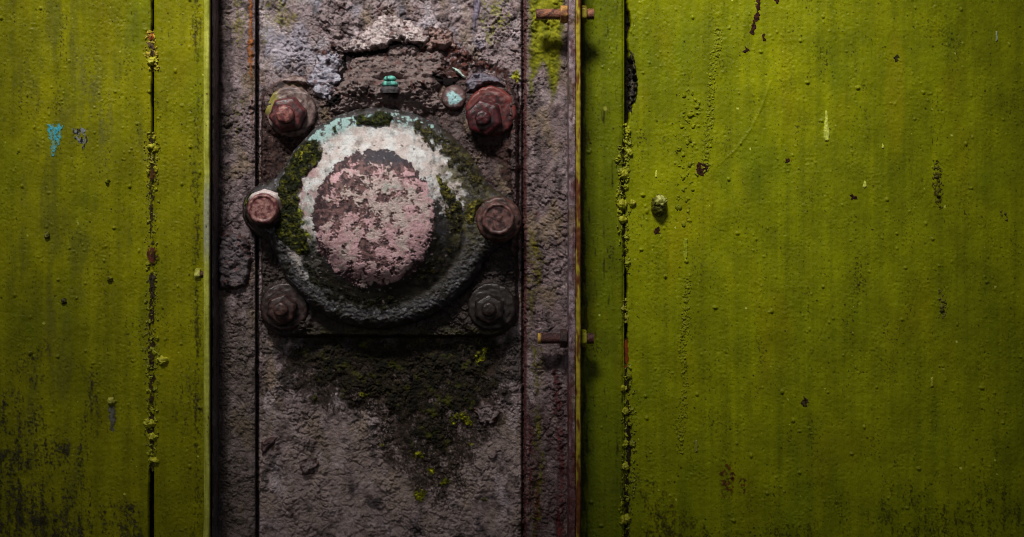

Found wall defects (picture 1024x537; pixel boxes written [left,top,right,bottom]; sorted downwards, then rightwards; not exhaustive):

peeling [279,14,457,102]
corrosion [314,35,509,117]
peeling [452,67,505,93]
corrosion [251,87,314,184]
corrosion [147,246,159,298]
damp [283,338,512,508]